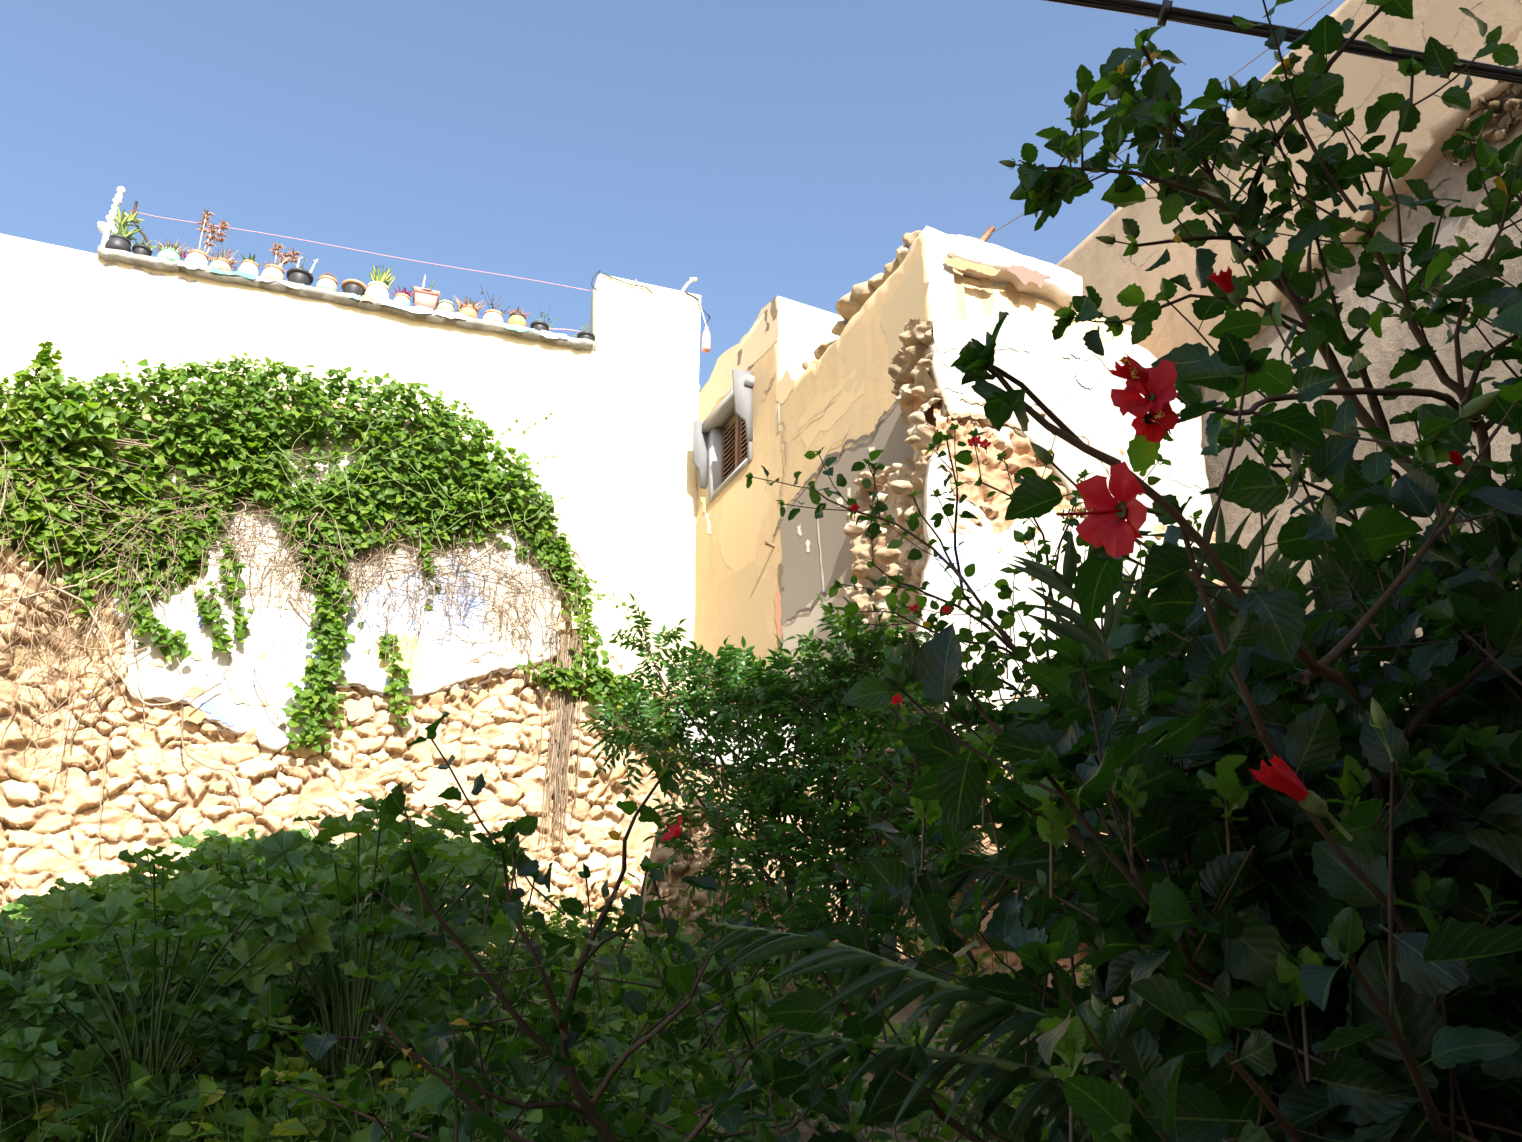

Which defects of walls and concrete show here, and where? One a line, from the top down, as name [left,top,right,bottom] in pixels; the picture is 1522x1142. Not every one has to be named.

spalling [944,256,1051,288]
crack [747,360,897,537]
crack [777,576,840,659]